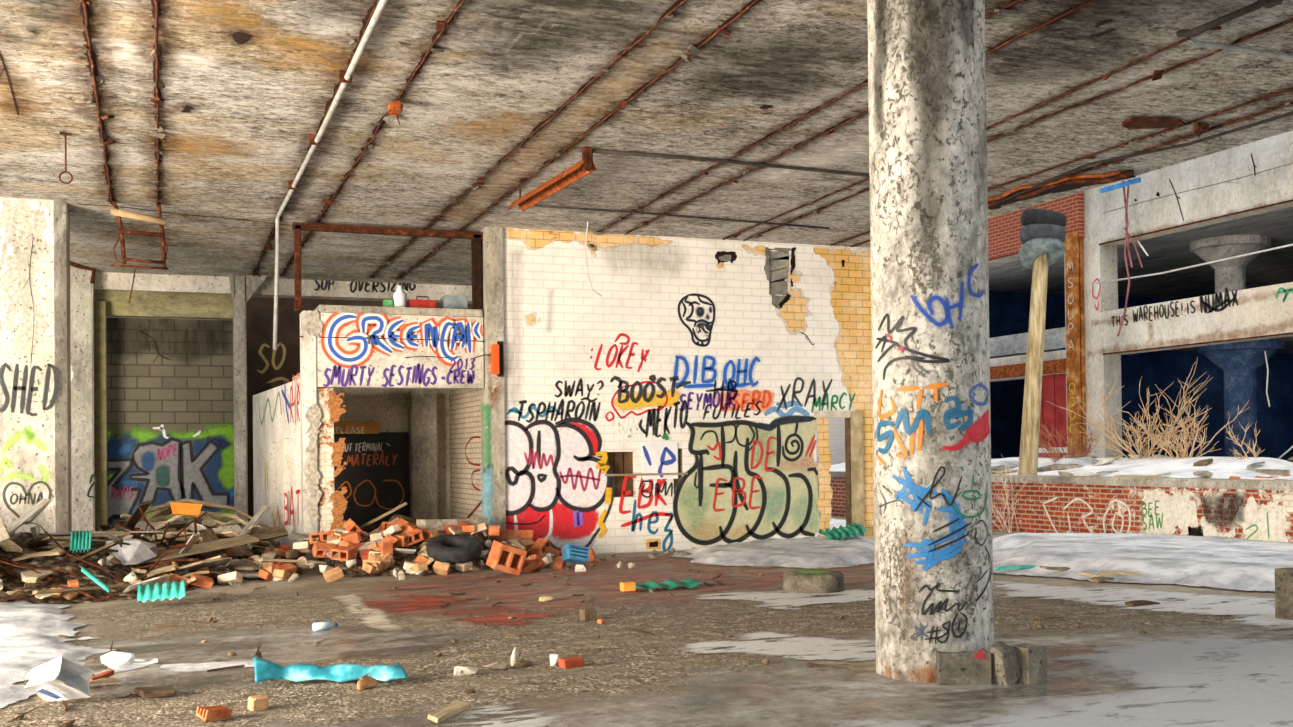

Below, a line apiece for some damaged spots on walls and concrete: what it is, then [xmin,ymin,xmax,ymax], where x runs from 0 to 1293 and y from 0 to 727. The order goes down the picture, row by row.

rust [387,100,403,125]
spalling [368,0,761,280]
peeling [503,79,869,258]
spalling [985,0,1097,55]
spalling [987,18,1293,142]
rust [1121,117,1209,137]
spalling [715,178,870,335]
flaking render [304,391,348,531]
peeling [1142,488,1288,543]